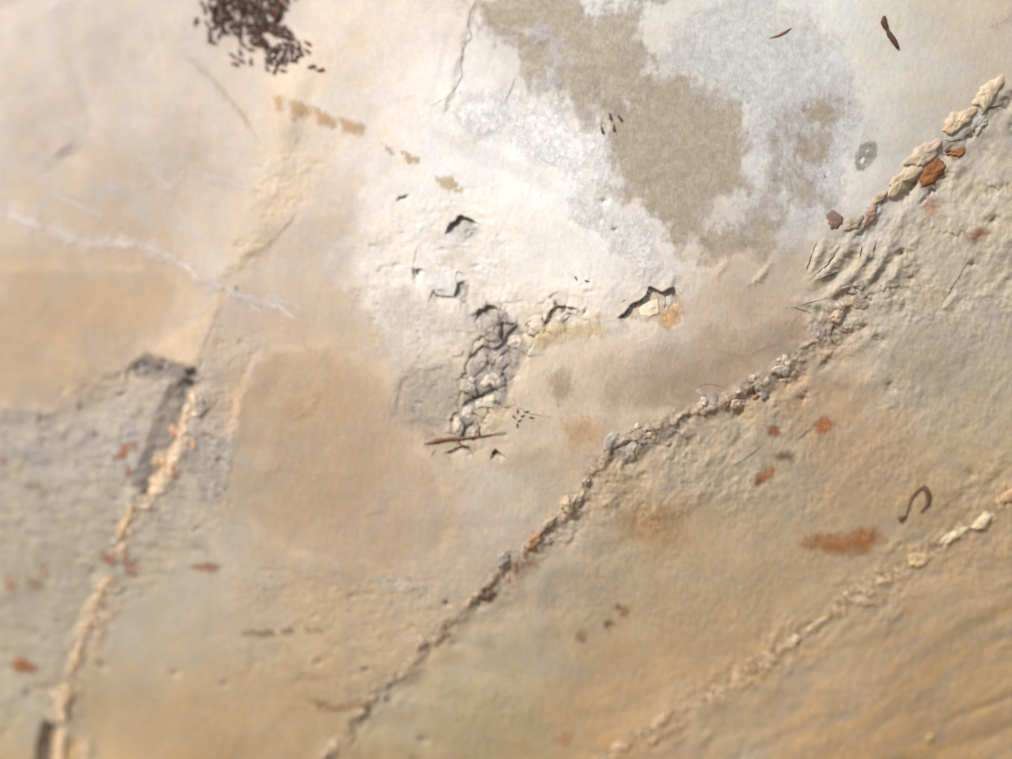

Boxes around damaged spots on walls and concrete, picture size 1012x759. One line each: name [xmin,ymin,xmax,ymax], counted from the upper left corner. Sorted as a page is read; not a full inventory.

crack [430,1,475,116]
damp [456,0,856,282]
crack [937,102,1007,156]
spalling [630,293,677,319]
spalling [136,354,197,439]
crack [333,241,881,750]
rust [808,529,876,552]